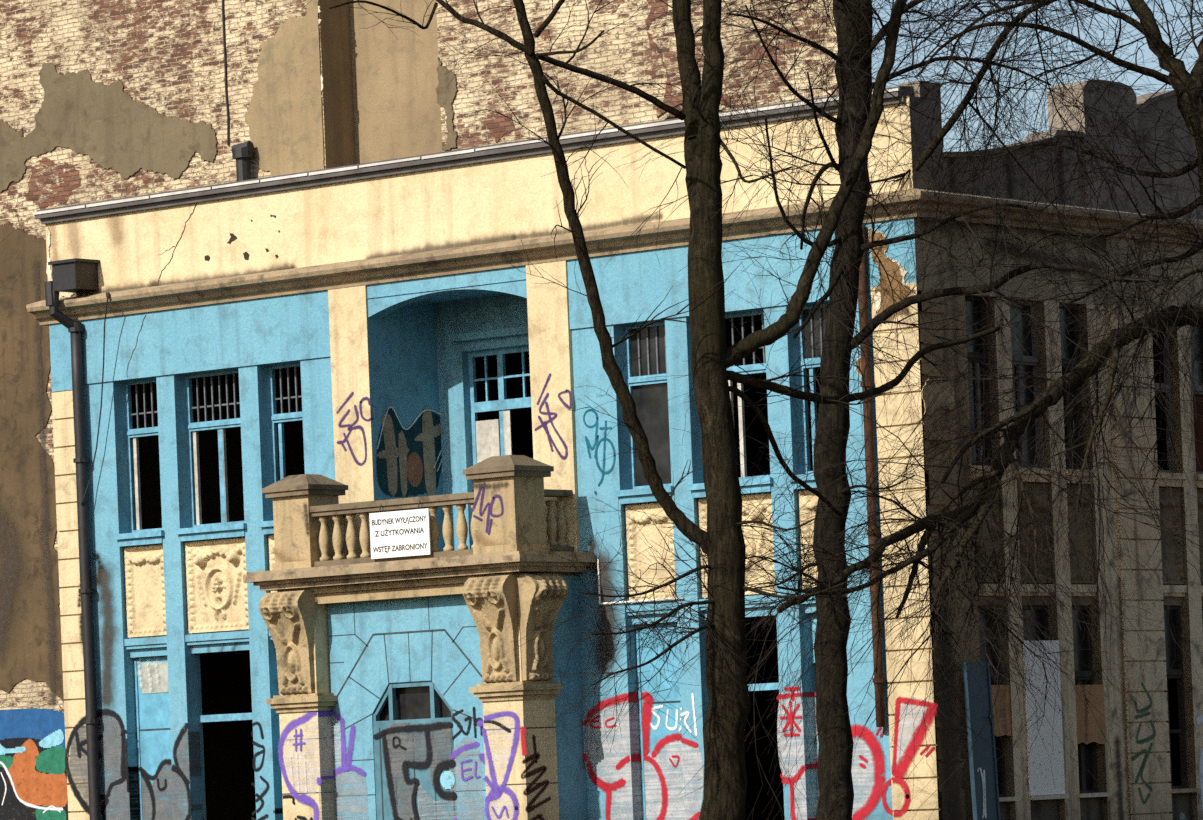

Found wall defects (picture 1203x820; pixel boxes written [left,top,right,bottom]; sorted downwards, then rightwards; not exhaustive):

flaking render [487,113,516,143]
flaking render [25,157,81,209]
peeling [46,227,74,297]
crack [158,203,197,282]
spalling [868,227,916,324]